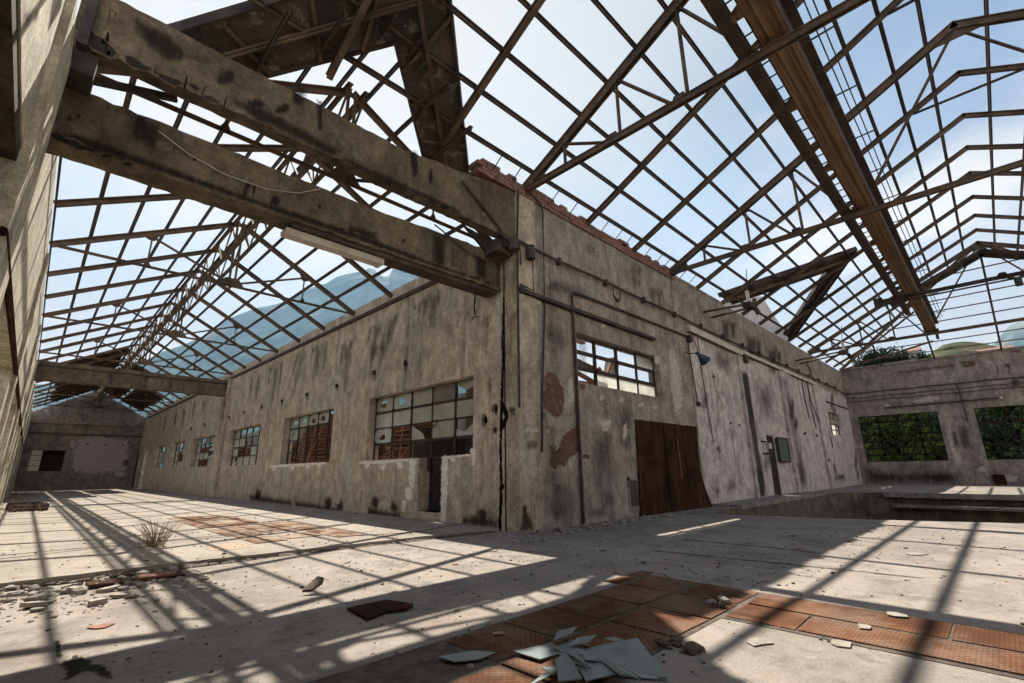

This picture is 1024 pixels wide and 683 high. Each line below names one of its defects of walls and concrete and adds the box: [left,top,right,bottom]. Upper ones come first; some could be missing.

water stain [136,19,183,59]
flaking render [468,158,674,280]
crack [472,295,523,531]
flaking render [540,371,591,471]
water stain [250,490,342,510]
water stain [368,497,400,517]